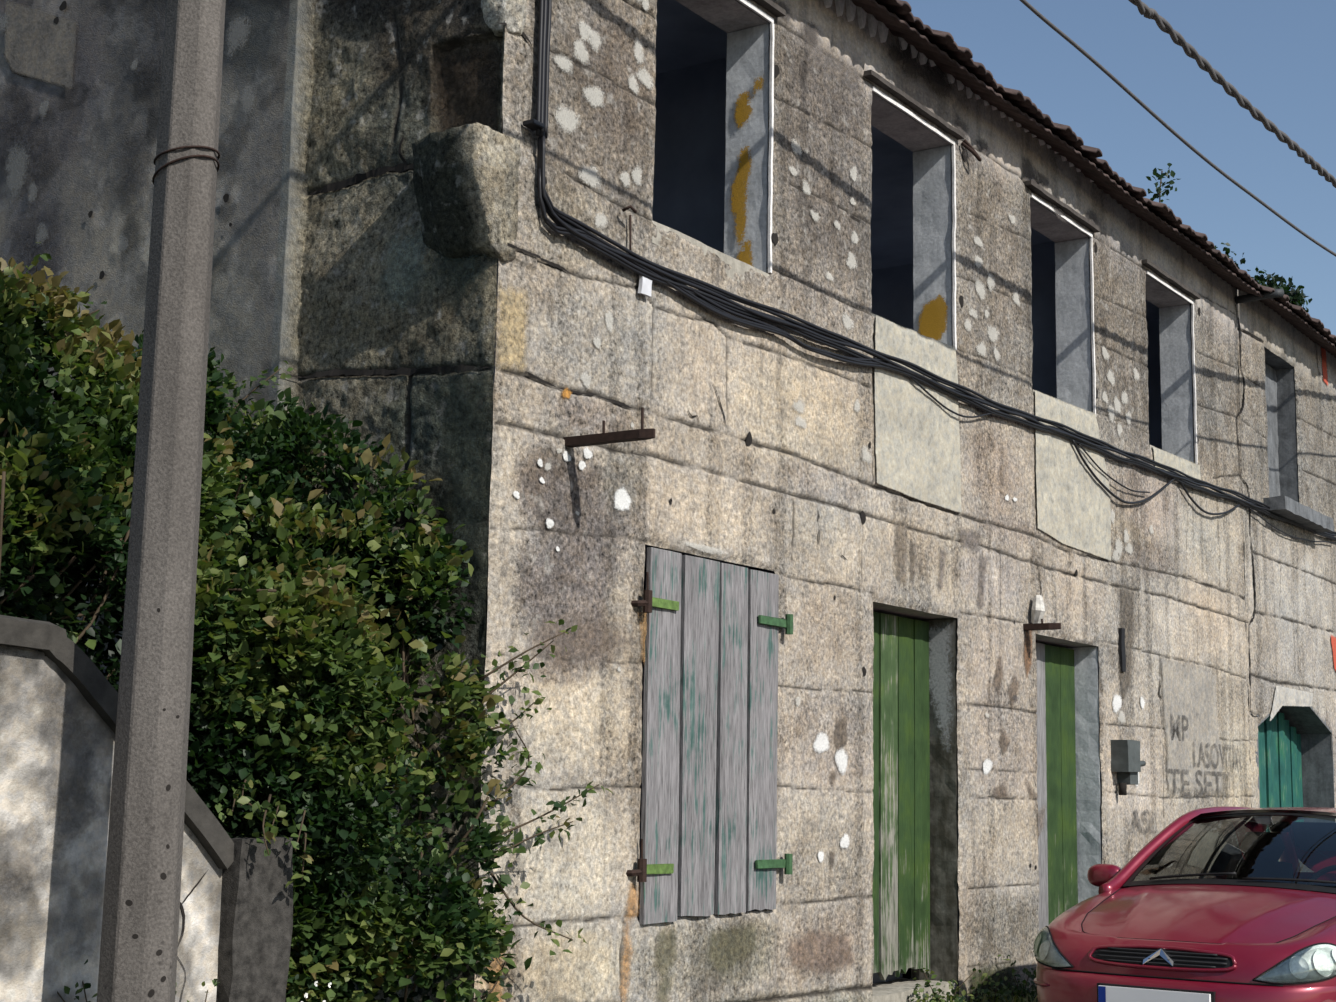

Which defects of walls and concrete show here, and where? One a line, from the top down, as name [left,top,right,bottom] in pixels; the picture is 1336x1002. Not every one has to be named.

crack [177,869,209,1002]